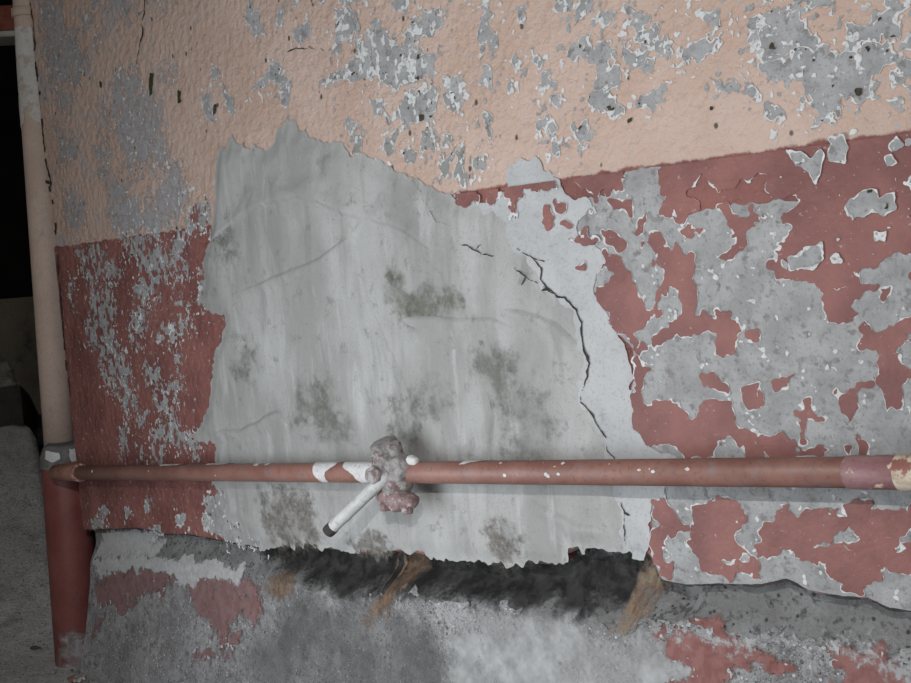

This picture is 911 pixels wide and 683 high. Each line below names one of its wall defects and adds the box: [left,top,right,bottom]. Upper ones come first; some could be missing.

peeling [196,45,295,132]
peeling [63,59,212,465]
crack [514,248,615,459]
peeling [243,0,911,458]
spalling [83,486,911,683]